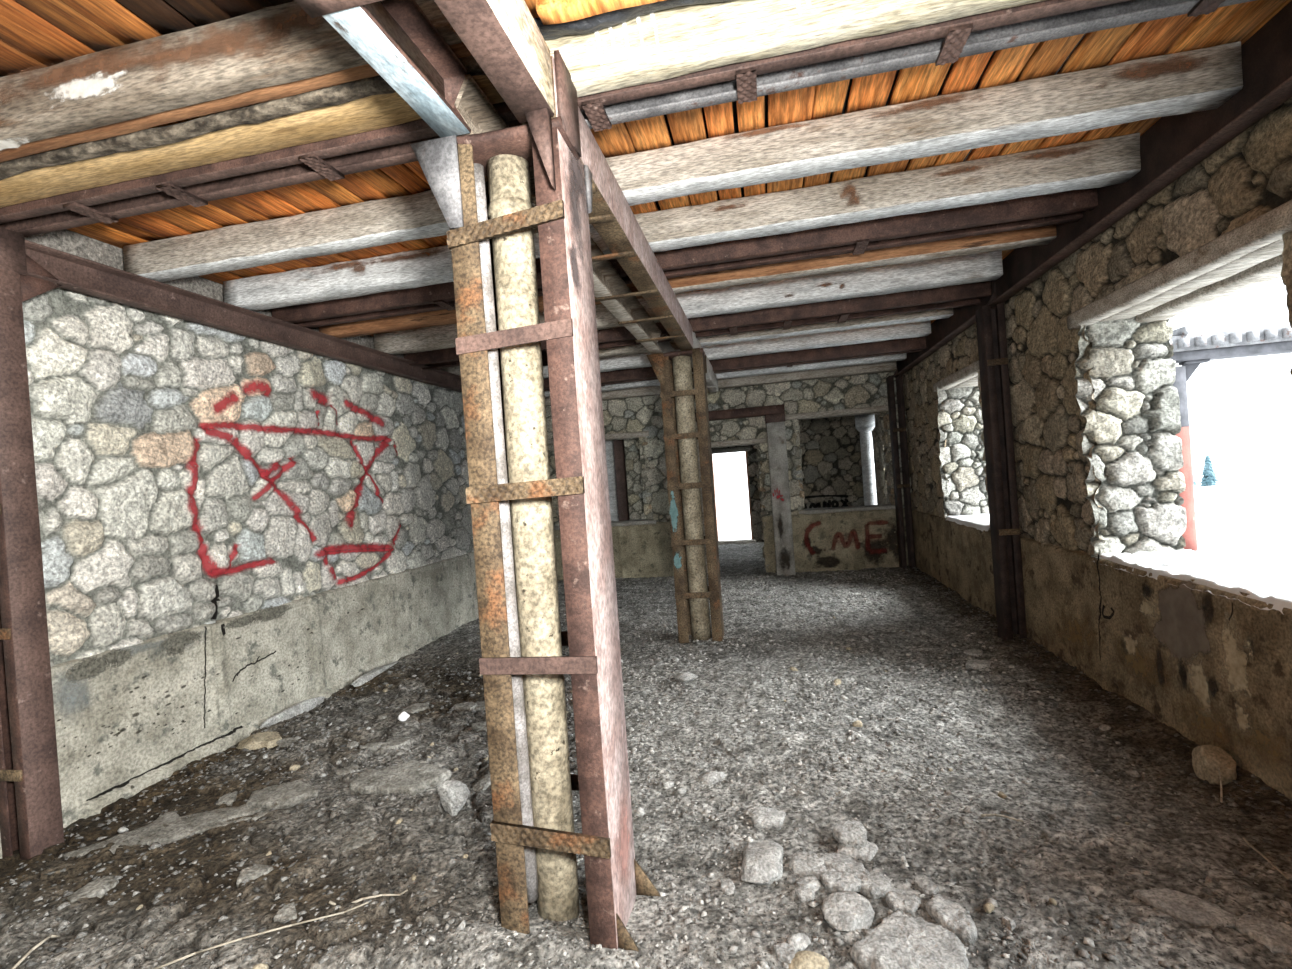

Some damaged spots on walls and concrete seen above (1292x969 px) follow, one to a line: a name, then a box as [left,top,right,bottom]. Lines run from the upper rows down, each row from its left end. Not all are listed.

crack [1096,554,1114,661]
water stain [1202,595,1213,626]
crack [86,585,276,801]
water stain [1156,650,1187,688]
water stain [1209,679,1218,697]